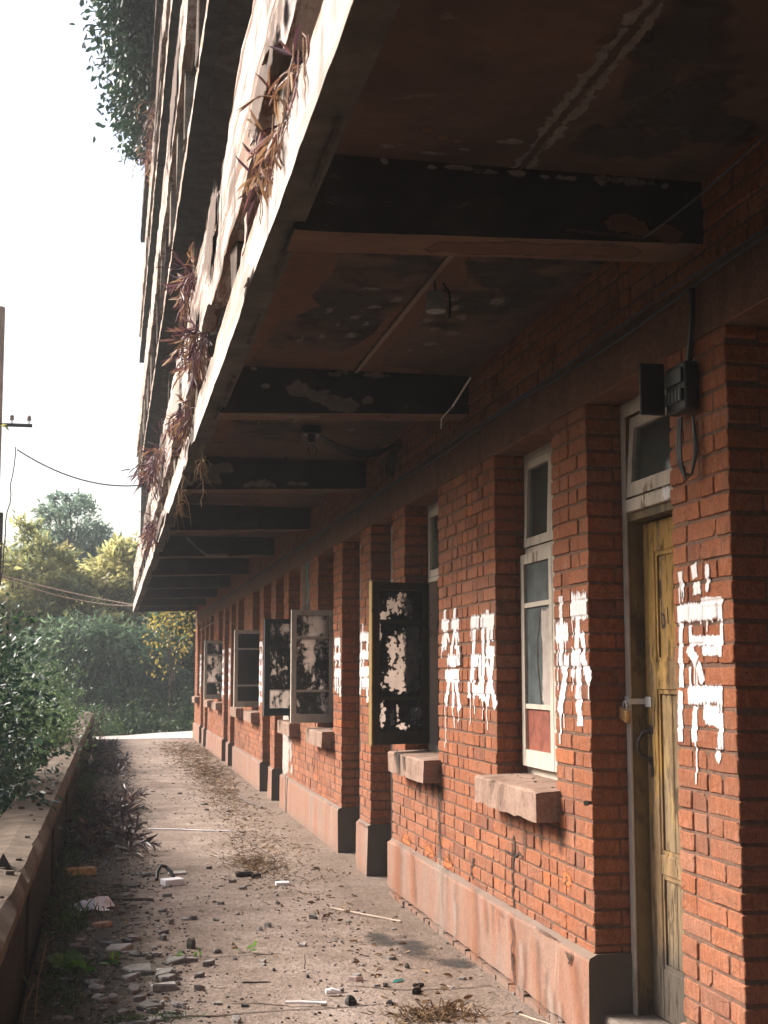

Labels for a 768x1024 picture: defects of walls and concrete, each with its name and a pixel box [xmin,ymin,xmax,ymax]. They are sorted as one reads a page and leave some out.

spalling [238,379,374,418]